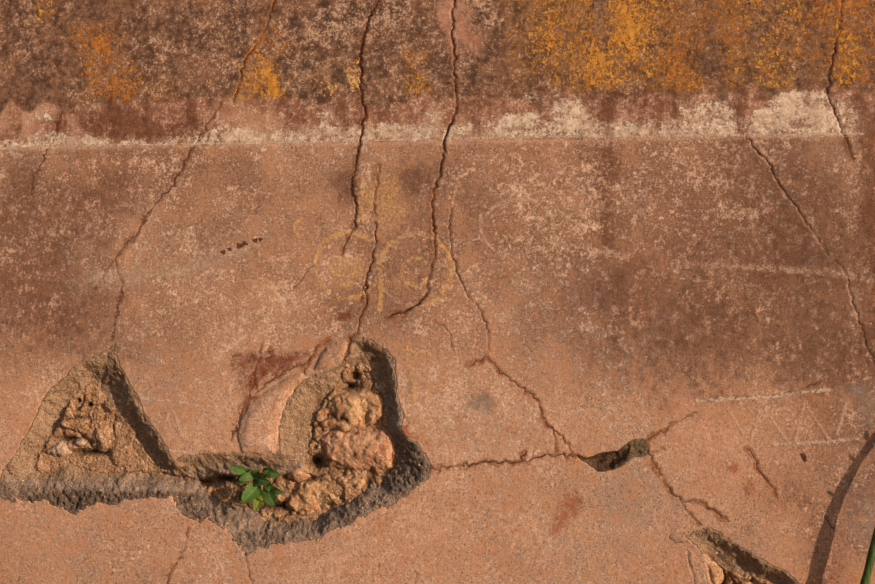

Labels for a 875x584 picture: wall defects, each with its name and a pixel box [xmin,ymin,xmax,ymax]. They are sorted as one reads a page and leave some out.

crack [93,0,276,341]
spalling [0,337,431,555]
crack [231,0,580,474]
spalling [685,527,798,584]
crack [642,137,875,527]
crack [823,0,856,160]